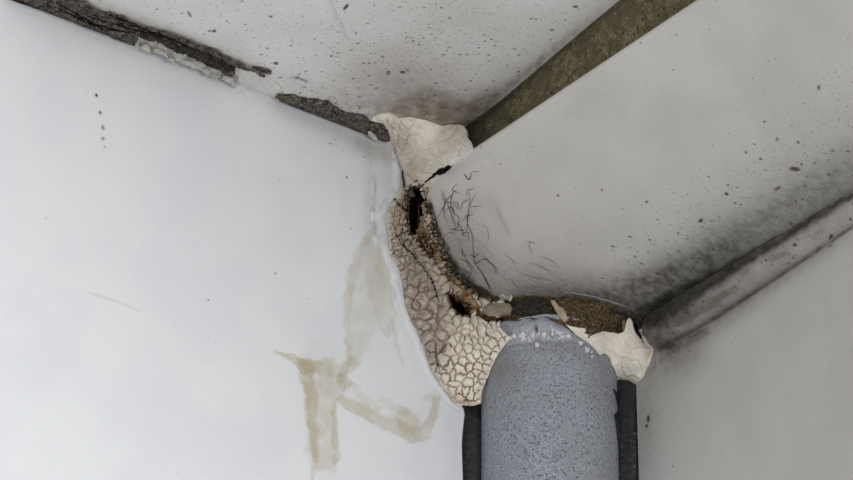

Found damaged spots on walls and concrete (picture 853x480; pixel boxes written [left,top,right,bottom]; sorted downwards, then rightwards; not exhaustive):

peeling [138,38,282,97]
rust [396,182,518,322]
peeling [449,285,476,307]
crack [432,171,515,291]
peeling [505,300,595,358]
water stain [637,193,853,325]